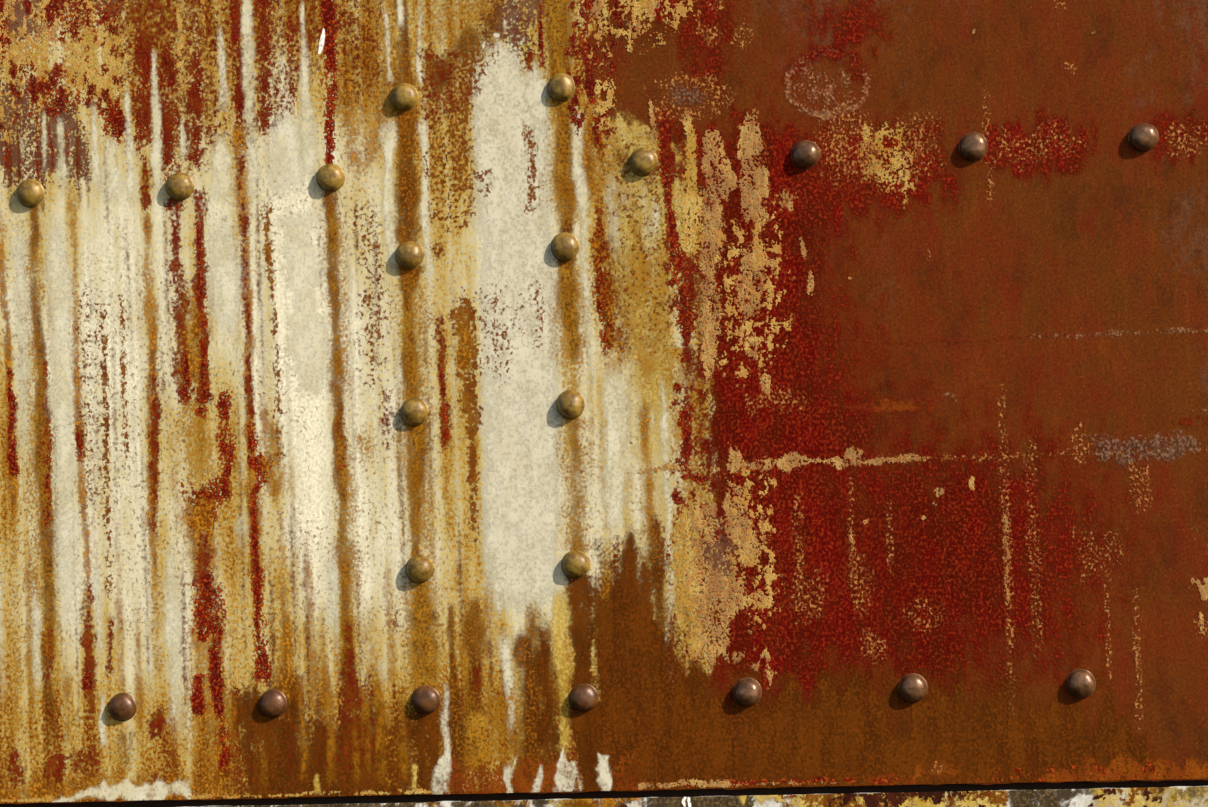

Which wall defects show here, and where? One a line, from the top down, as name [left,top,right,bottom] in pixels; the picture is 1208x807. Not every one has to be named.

corrosion [641,0,741,98]
corrosion [801,0,893,60]
peeling [560,0,824,700]
corrosion [0,0,600,803]
corrosion [549,88,1208,791]
peeling [861,633,886,659]
corrosion [555,798,641,807]
corrosion [740,790,1010,807]
corrosion [1088,787,1208,807]